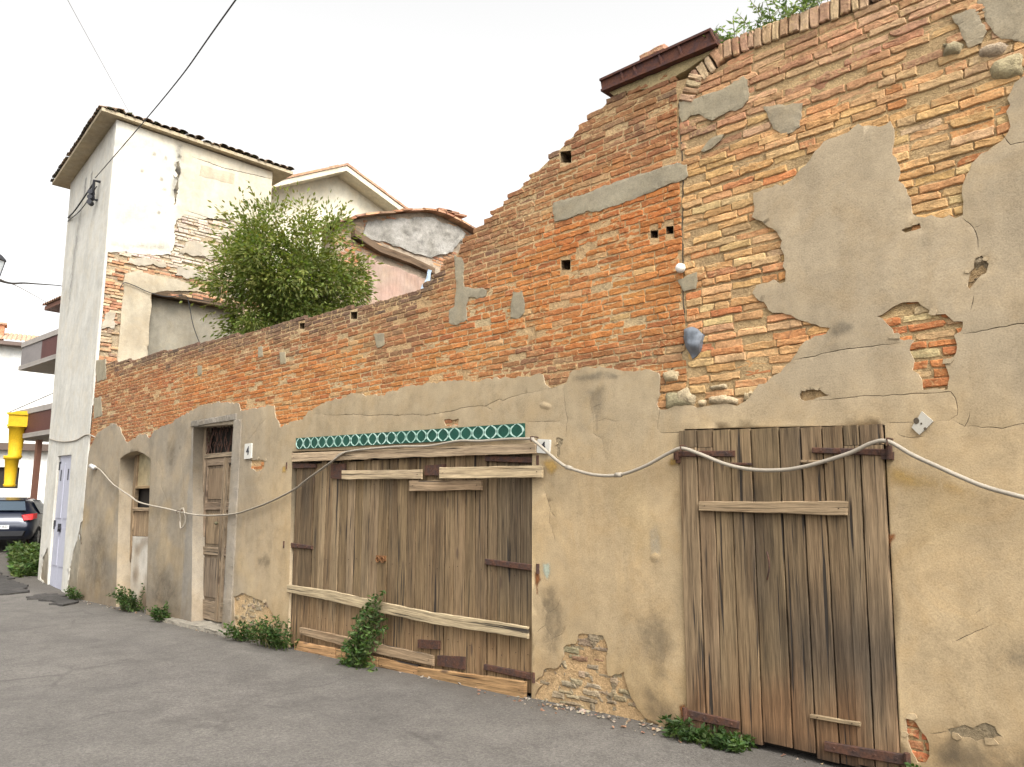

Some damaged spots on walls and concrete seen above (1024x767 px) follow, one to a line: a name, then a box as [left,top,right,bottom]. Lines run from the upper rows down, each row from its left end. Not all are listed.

flaking render [965,256,989,283]
crack [799,342,900,359]
flaking render [879,302,962,394]
flaking render [537,634,636,714]
flaking render [898,713,929,763]
flaking render [948,723,1001,745]